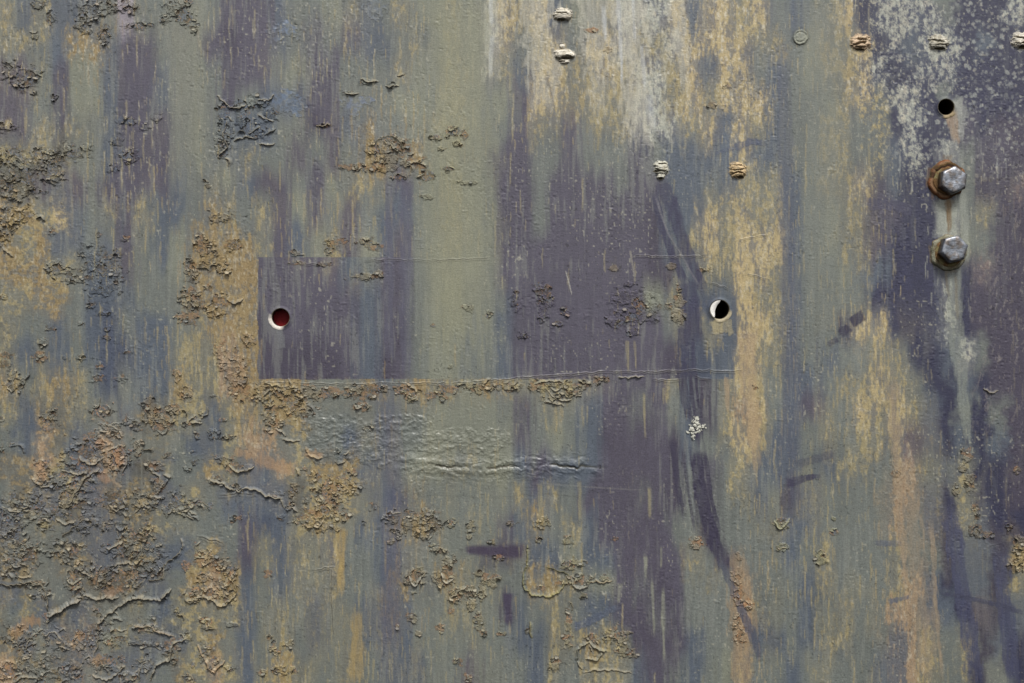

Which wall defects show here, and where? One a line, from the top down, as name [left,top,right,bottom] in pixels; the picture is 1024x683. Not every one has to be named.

peeling [0,59,59,102]
peeling [0,117,96,258]
peeling [213,87,337,167]
peeling [334,124,478,201]
peeling [173,207,247,328]
peeling [663,261,687,326]
peeling [0,229,644,683]